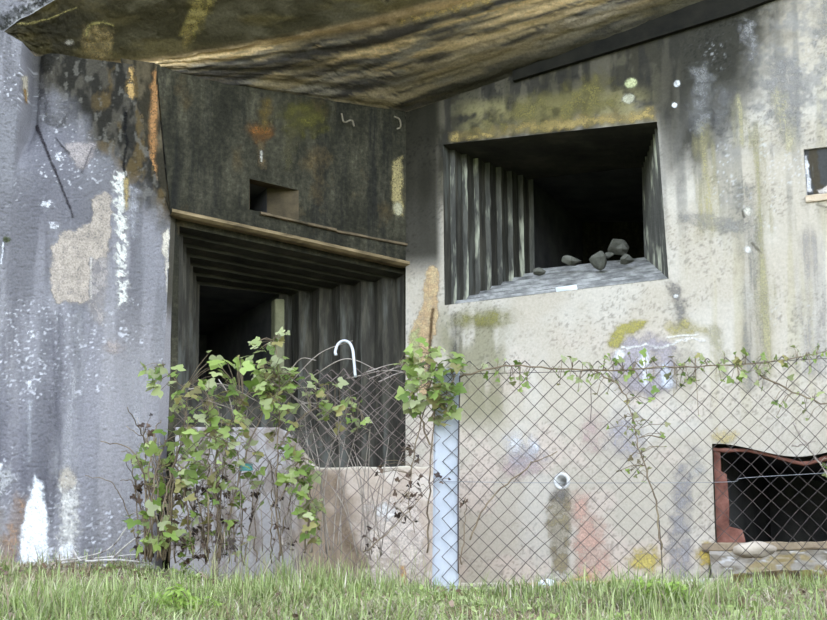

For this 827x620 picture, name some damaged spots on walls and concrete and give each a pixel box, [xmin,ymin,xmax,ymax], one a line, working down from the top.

peeling [50,192,112,323]
water stain [0,463,16,496]